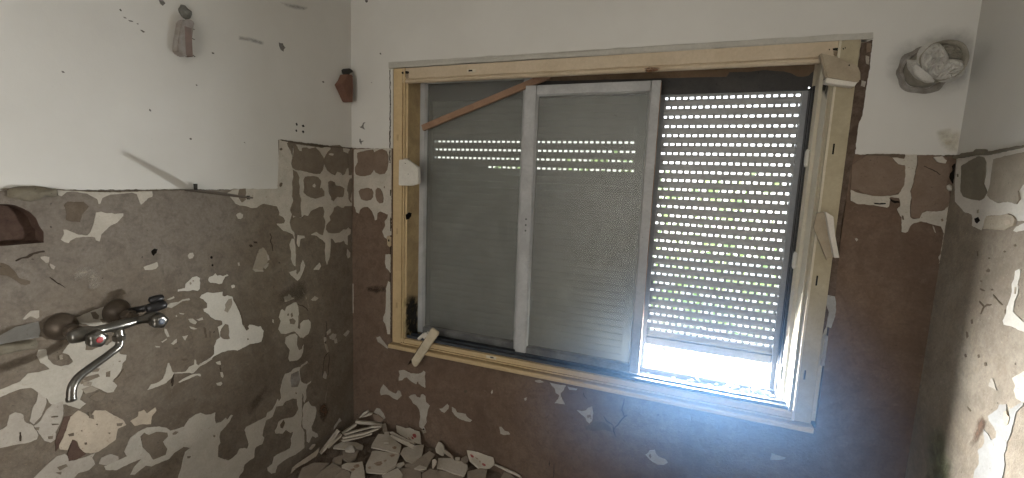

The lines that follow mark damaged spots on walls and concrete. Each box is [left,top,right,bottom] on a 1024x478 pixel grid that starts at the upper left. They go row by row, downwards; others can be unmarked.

flaking render [0,204,44,246]
spalling [64,202,89,222]
spalling [249,241,270,272]
flaking render [155,313,211,361]
spalling [67,440,86,461]